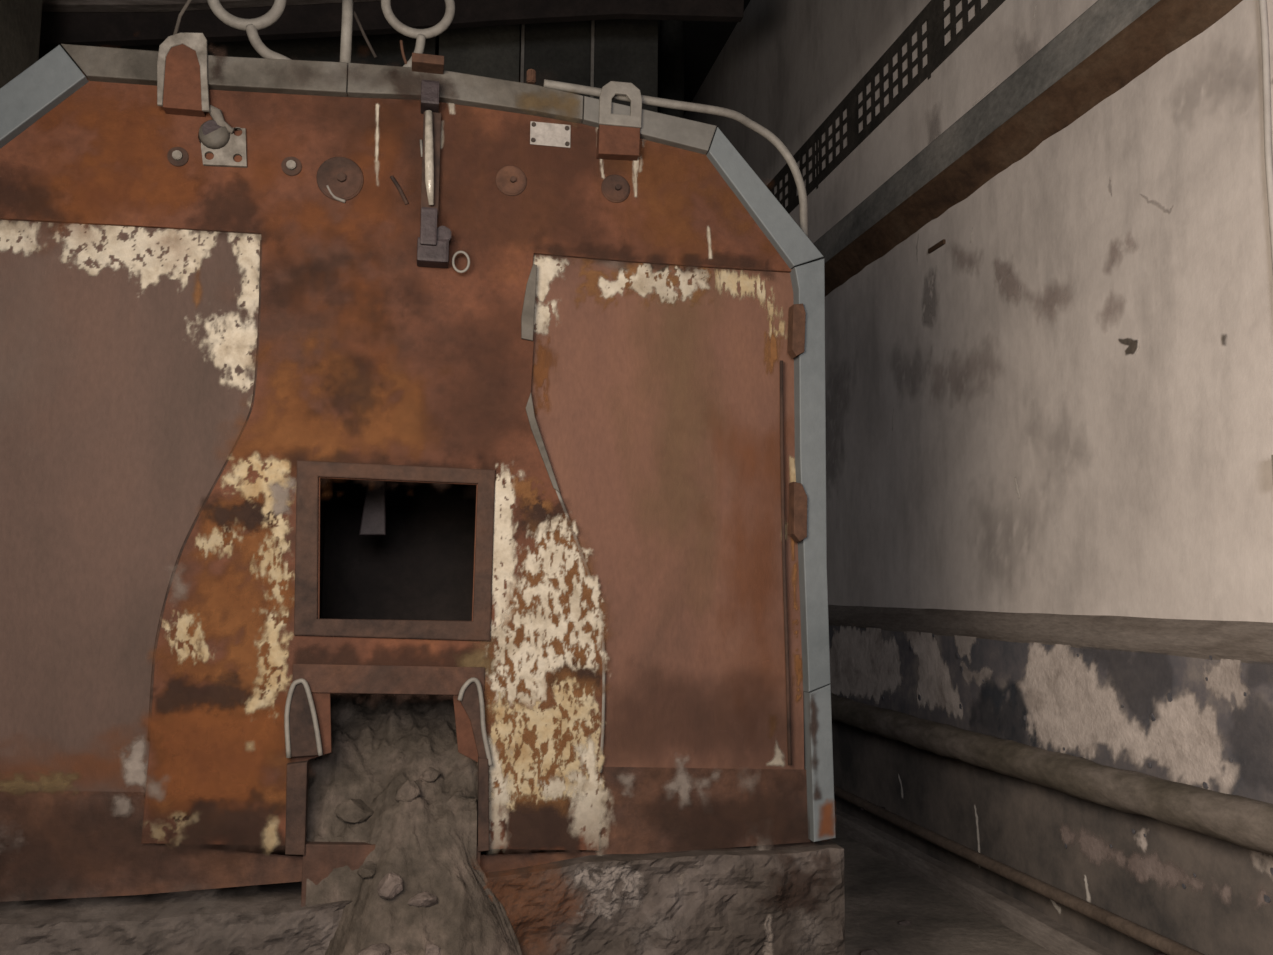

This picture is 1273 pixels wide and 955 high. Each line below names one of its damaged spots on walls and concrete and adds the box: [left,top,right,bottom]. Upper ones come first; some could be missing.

peeling [829,625,992,719]
peeling [1016,642,1250,794]